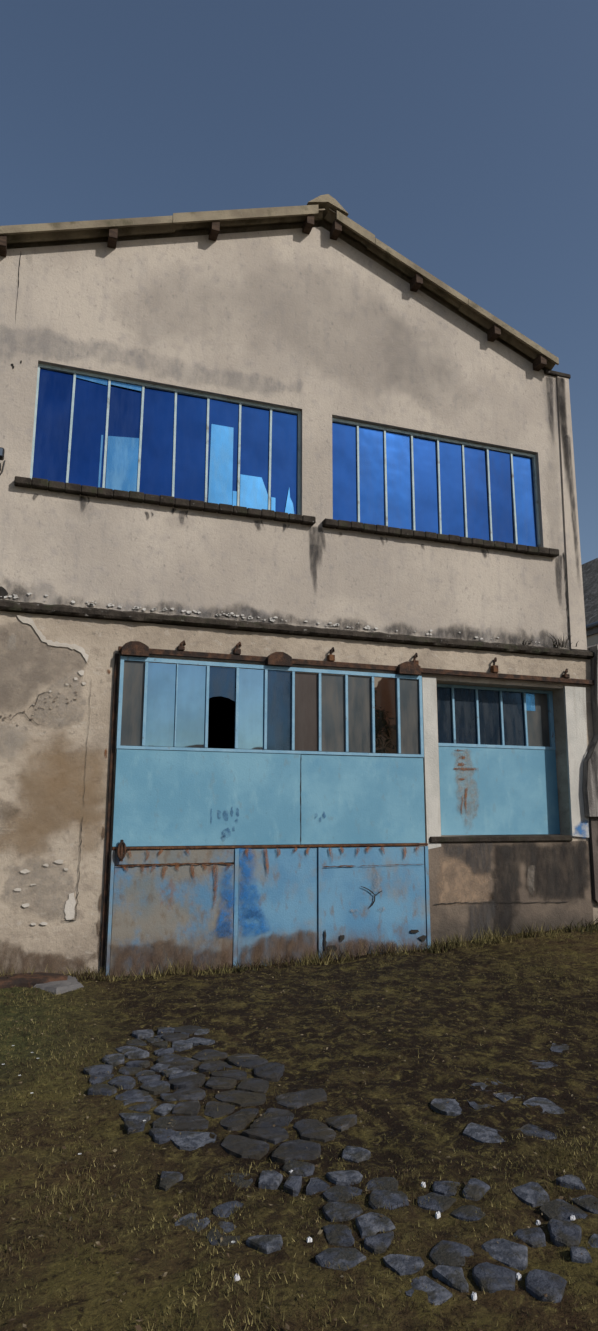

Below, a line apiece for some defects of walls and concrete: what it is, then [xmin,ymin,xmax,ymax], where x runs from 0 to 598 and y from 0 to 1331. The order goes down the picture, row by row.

leakage [502,377,579,650]
leakage [310,527,325,584]
peeling [71,600,287,622]
spalling [0,586,89,694]
peeling [14,859,68,908]
peeling [64,892,76,920]
rust [116,849,233,899]